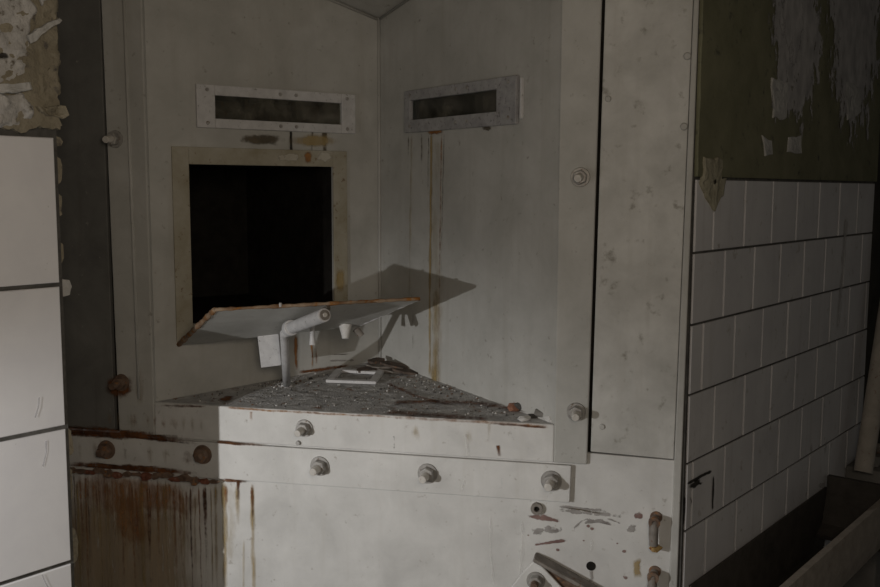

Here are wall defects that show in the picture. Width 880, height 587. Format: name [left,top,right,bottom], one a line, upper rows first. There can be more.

peeling [0,0,69,128]
peeling [770,0,880,154]
rust [72,477,242,587]